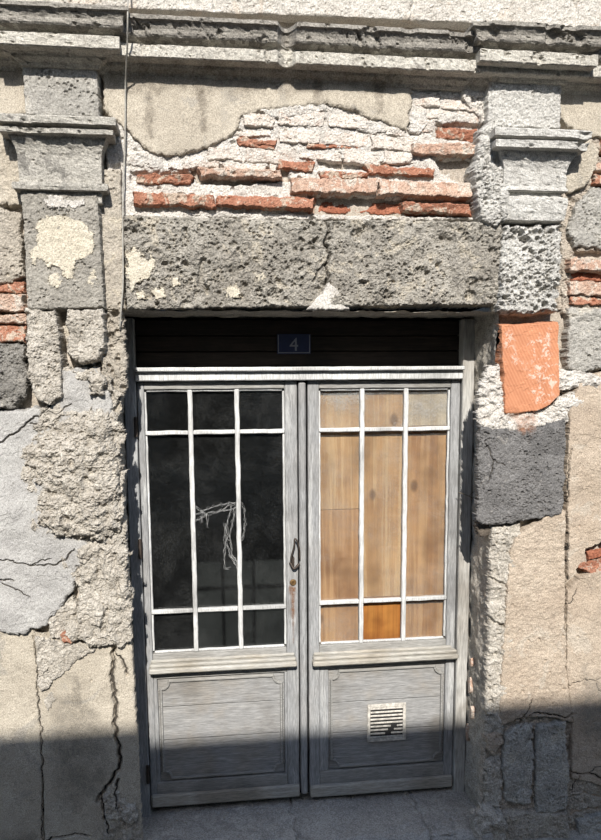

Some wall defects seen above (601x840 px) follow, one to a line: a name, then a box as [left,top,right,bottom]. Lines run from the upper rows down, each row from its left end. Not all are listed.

flaking render [106,89,482,222]
crack [313,223,331,285]
spalling [489,137,601,319]
crack [0,396,70,443]
crack [0,549,75,596]
crack [35,648,128,840]
flaking render [34,540,134,711]
flaking render [466,521,601,840]
crack [503,699,572,727]
crack [562,455,576,630]